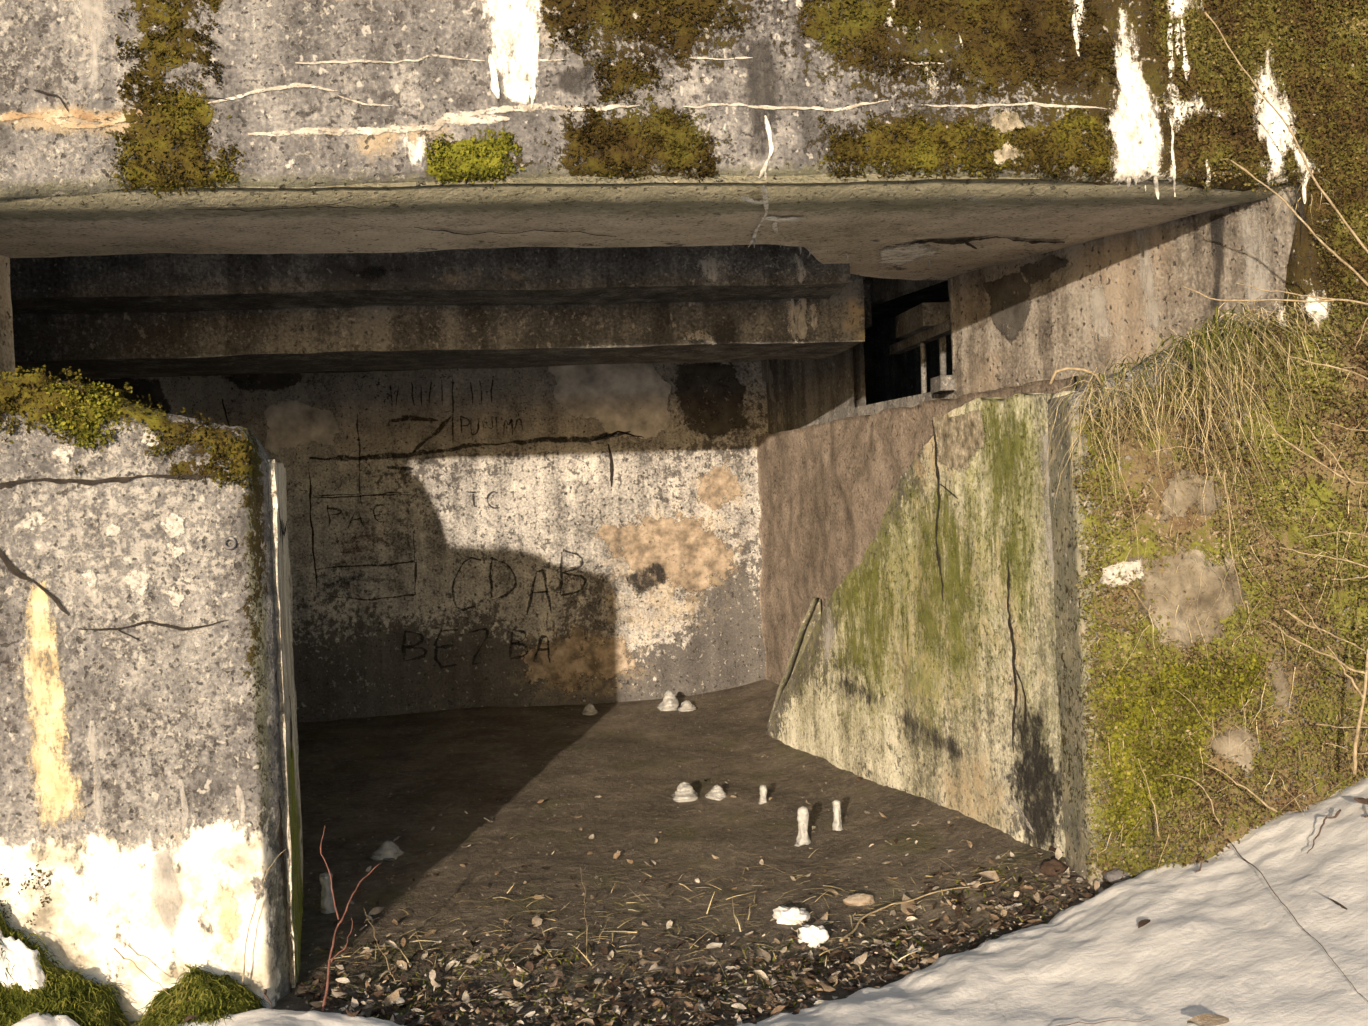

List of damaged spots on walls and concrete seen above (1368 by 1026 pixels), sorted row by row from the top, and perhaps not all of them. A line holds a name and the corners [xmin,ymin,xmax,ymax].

crack [34,89,69,112]
leakage [482,0,541,107]
leakage [1109,0,1203,199]
leakage [1255,51,1309,204]
crack [0,469,234,489]
leakage [1043,434,1054,577]
crack [0,549,227,641]
crack [1007,560,1027,753]
leakage [0,580,281,1022]
leakage [900,713,962,761]
leakage [1011,707,1062,849]